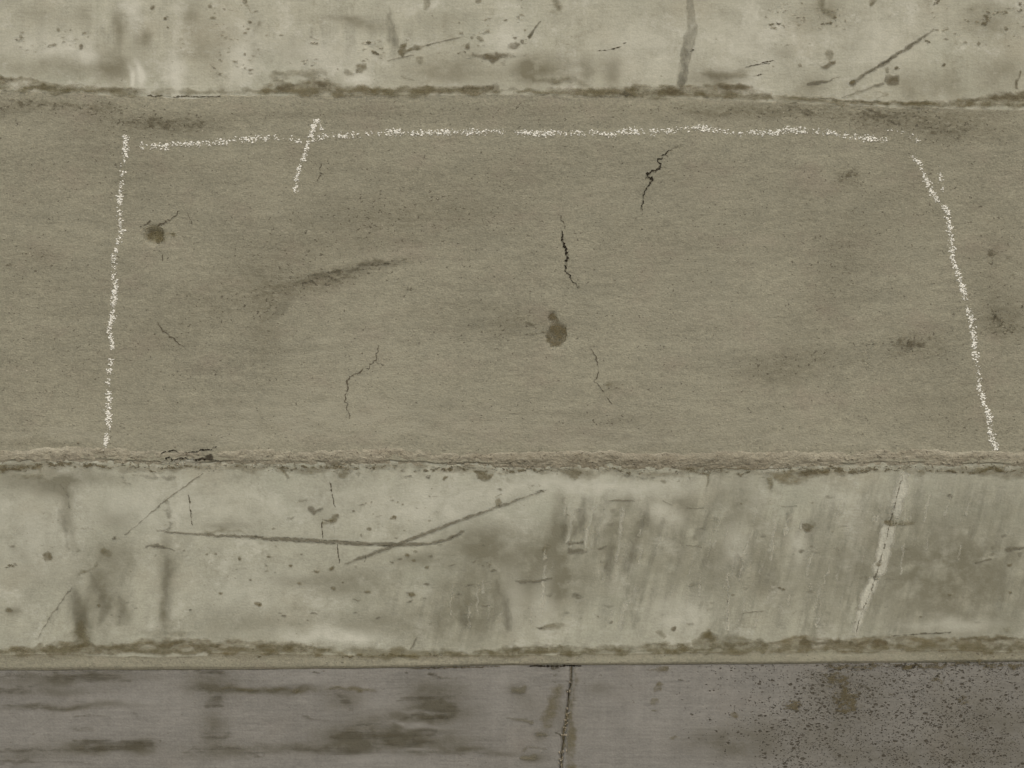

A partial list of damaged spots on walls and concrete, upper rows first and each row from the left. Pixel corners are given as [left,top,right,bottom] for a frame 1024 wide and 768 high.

crack [641,150,669,210]
crack [561,216,579,289]
crack [344,345,382,419]